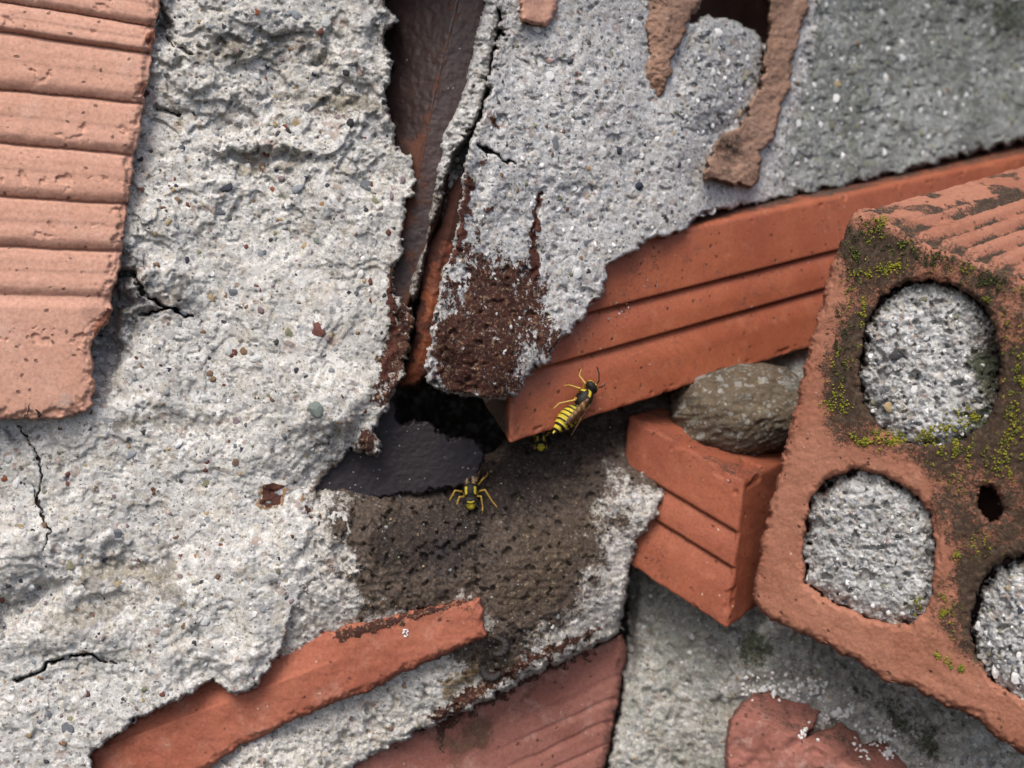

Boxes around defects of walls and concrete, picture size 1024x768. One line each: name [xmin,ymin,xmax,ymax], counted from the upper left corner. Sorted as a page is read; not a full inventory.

crack [437,88,514,228]
crack [134,273,194,318]
crack [17,403,52,552]
damp [359,405,644,621]
damp [344,594,424,626]
crack [14,653,118,682]
damp [442,664,481,699]